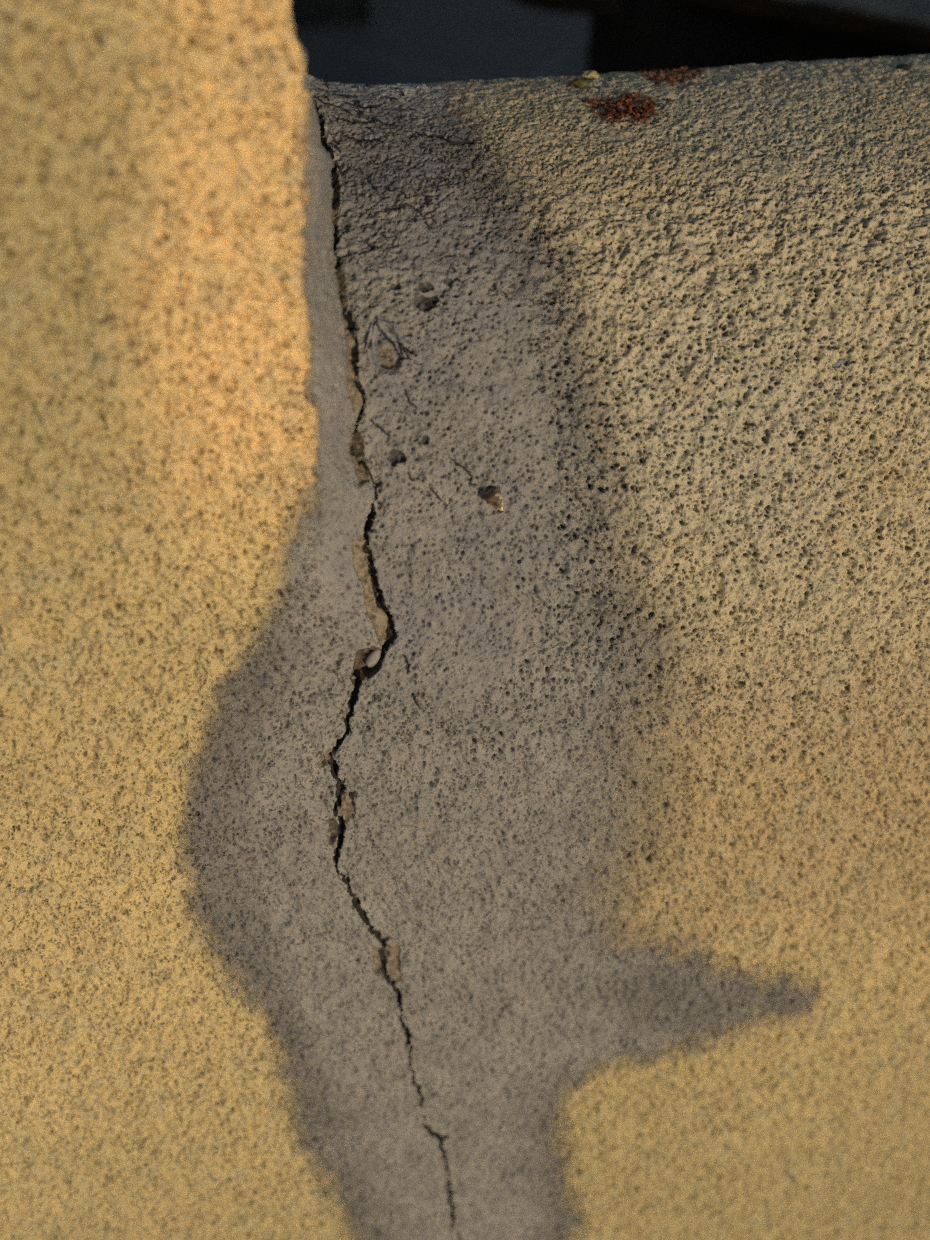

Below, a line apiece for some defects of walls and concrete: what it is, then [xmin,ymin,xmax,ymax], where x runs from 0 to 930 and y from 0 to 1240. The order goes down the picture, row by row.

crack [309,81,478,1240]